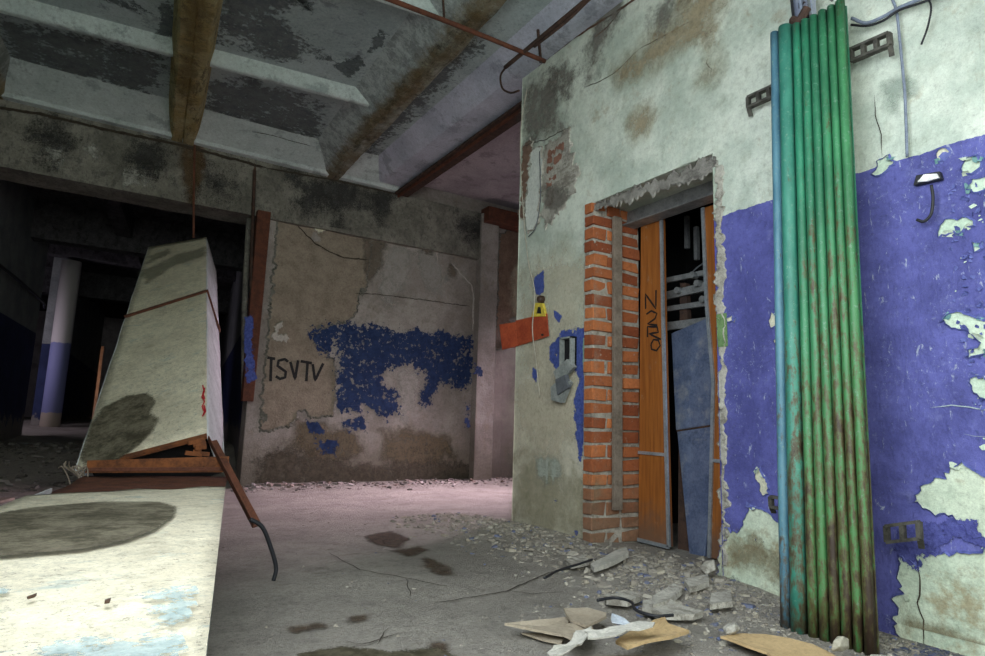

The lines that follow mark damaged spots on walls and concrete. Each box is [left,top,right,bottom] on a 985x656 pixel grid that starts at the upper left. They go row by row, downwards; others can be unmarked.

leakage [0,16,170,95]
leakage [216,0,385,78]
leakage [587,2,622,79]
leakage [616,0,715,80]
leakage [205,74,328,139]
leakage [524,62,574,144]
peeling [870,154,896,178]
flaking render [495,126,596,462]
peeling [934,146,985,410]
peeling [258,221,374,458]
peeling [594,156,780,597]
peeling [891,460,985,656]